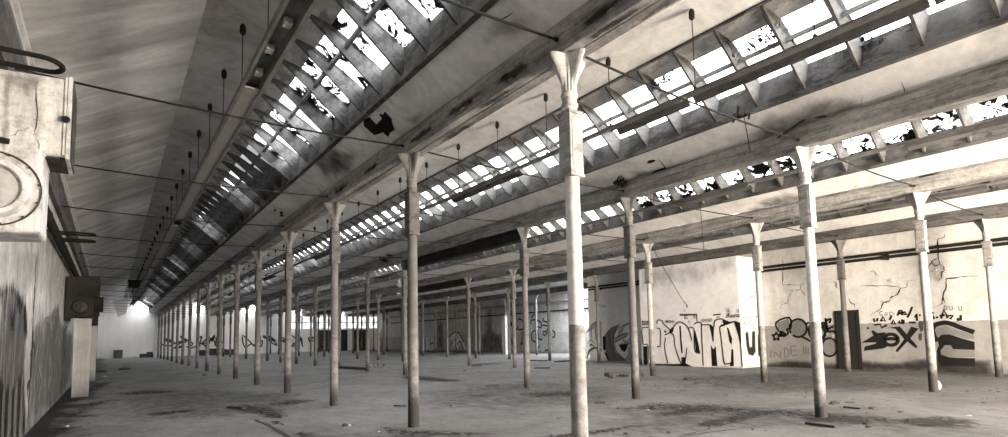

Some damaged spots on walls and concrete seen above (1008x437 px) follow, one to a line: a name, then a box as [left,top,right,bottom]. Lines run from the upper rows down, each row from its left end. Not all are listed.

crack [11,80,40,148]
crack [833,235,967,313]